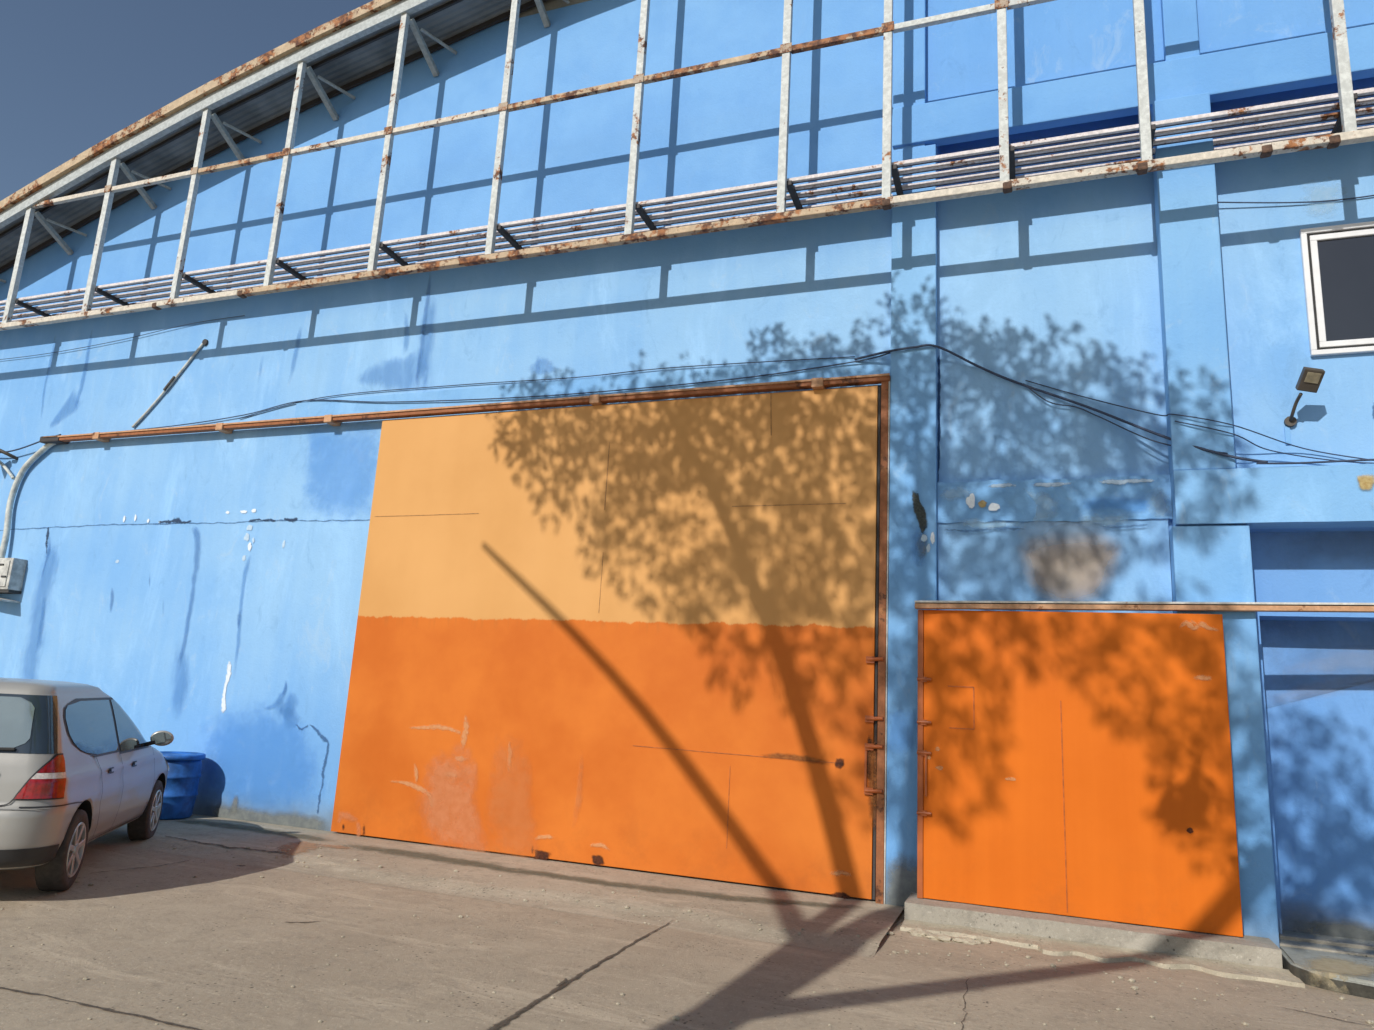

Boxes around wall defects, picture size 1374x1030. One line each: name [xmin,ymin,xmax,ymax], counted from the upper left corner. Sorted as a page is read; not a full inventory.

flaking render [912,491,935,556]
damp [221,662,232,713]
damp [213,798,321,830]